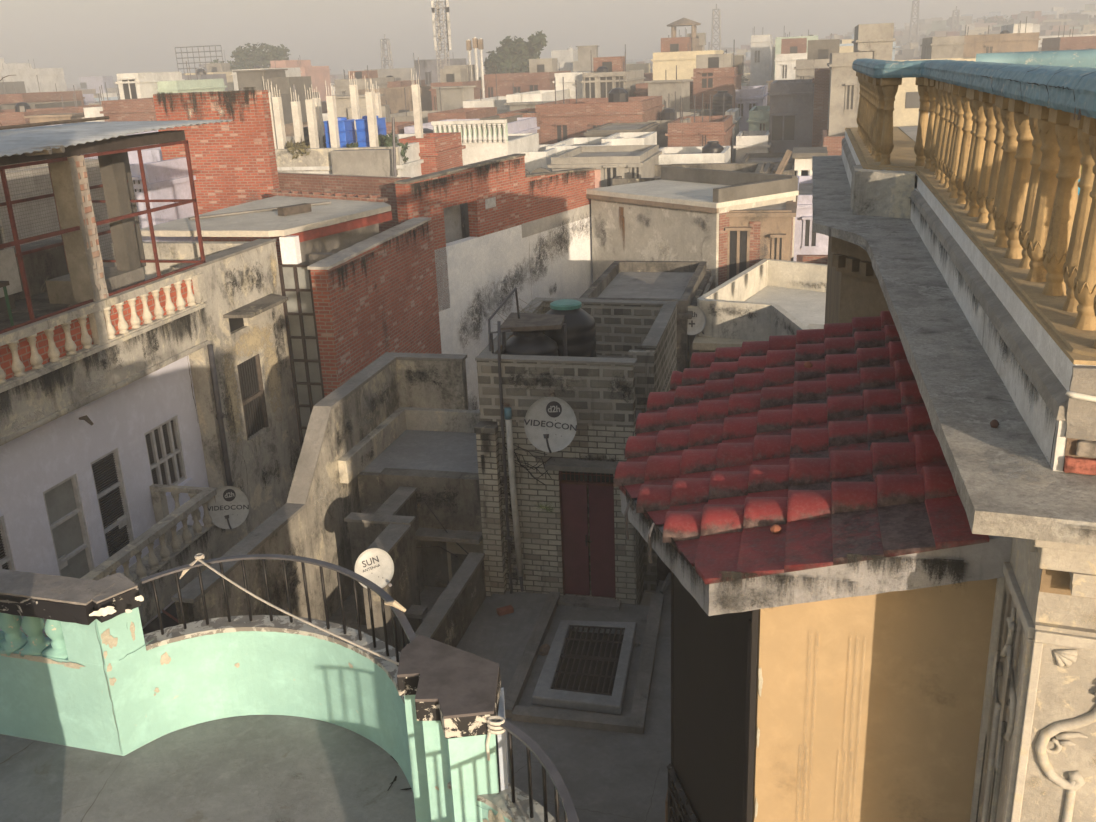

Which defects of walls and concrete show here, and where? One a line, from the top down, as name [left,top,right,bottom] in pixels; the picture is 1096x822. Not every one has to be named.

flaking render [1063,438,1096,475]
damp [720,570,812,610]
damp [847,553,967,583]
peeling [89,595,144,641]
peeling [101,628,118,686]
crack [78,625,151,822]